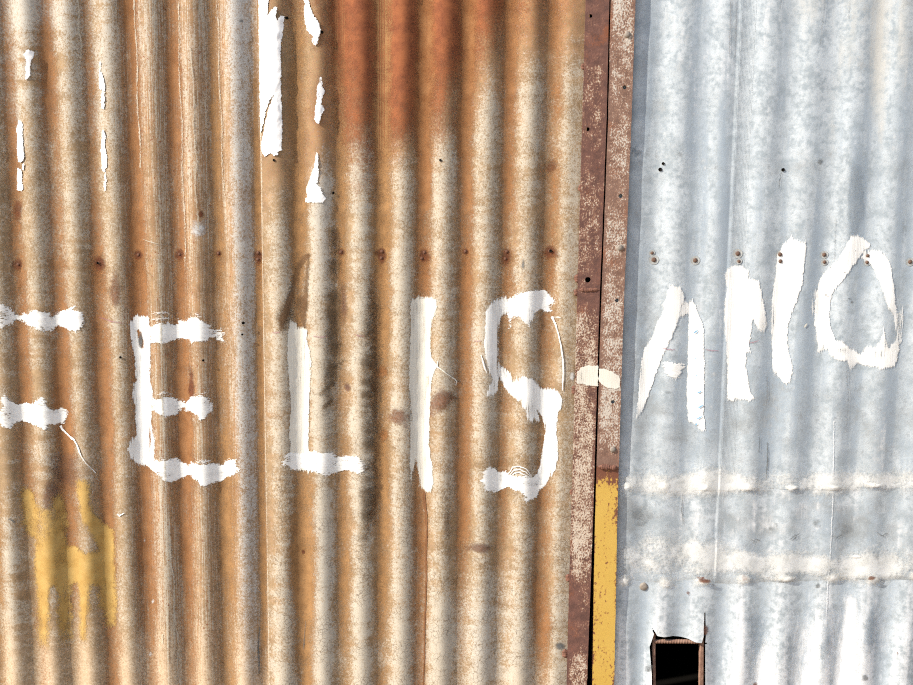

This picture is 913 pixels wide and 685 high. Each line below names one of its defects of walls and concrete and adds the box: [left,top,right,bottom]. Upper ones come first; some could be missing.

corrosion [0,0,32,405]
corrosion [37,0,78,550]
corrosion [83,37,118,602]
corrosion [119,0,149,390]
corrosion [164,0,188,324]
corrosion [172,338,196,685]
corrosion [253,79,268,681]
water stain [276,254,310,330]
corrosion [287,470,317,685]
water stain [319,291,349,409]
water stain [358,290,383,547]
corrosion [328,0,521,685]